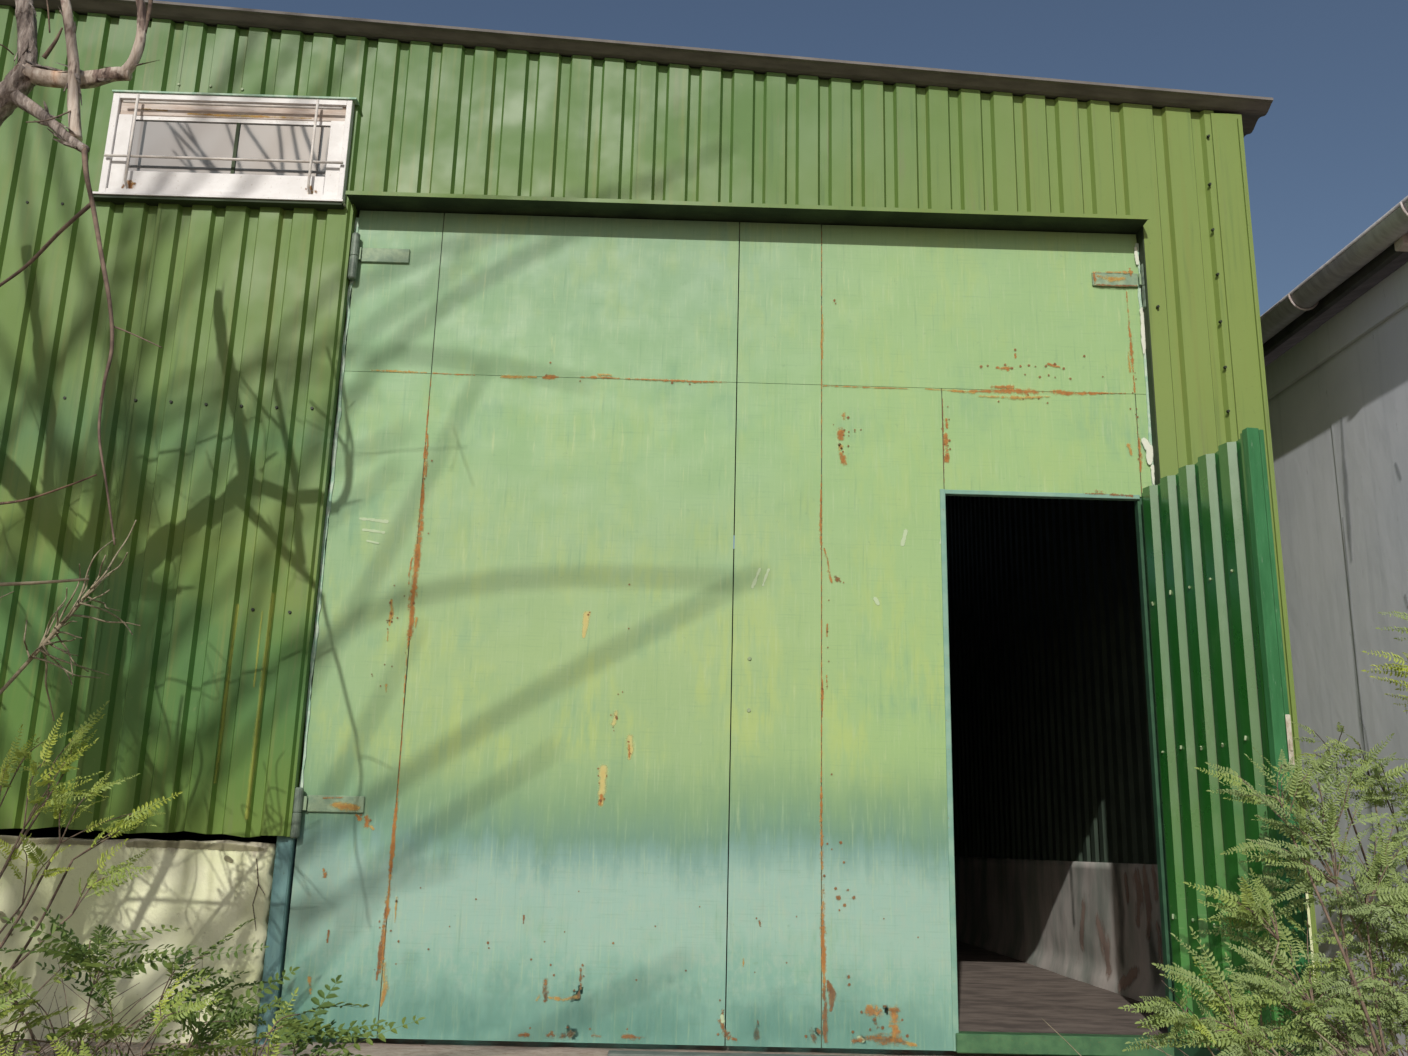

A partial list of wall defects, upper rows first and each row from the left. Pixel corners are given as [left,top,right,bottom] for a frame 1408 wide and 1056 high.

rust [501,362,558,379]
rust [579,374,722,385]
rust [820,232,907,465]
rust [926,268,1139,462]
rust [371,370,469,1006]
rust [805,475,855,1043]
rust [323,797,374,830]
rust [537,964,584,1002]
rust [852,1005,917,1046]